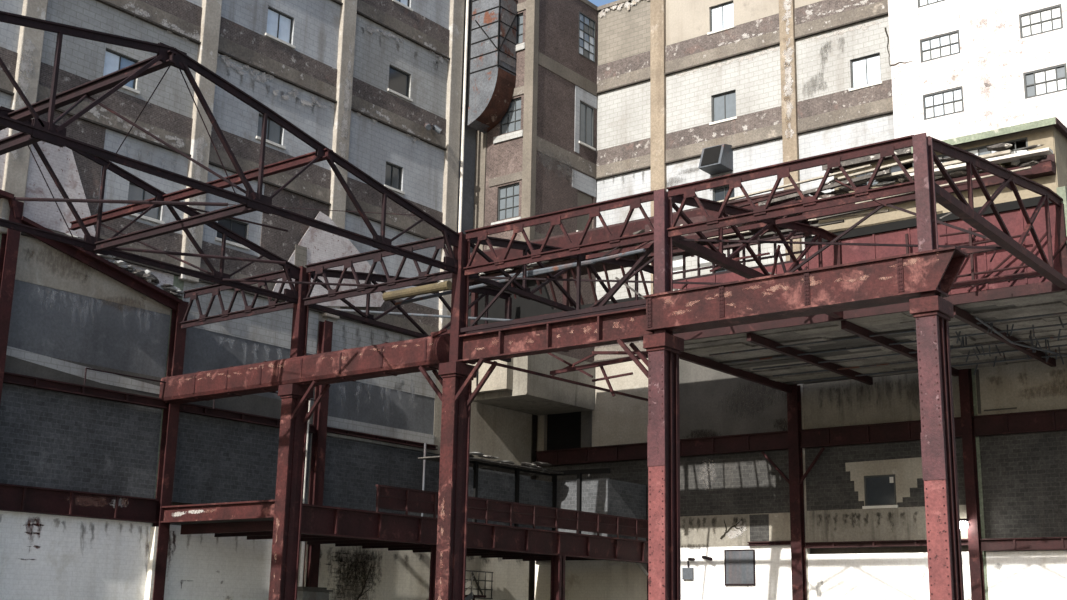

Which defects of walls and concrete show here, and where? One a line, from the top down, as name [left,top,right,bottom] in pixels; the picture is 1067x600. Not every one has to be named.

spalling [598,0,649,17]
peeling [218,45,430,177]
corrosion [18,518,43,560]